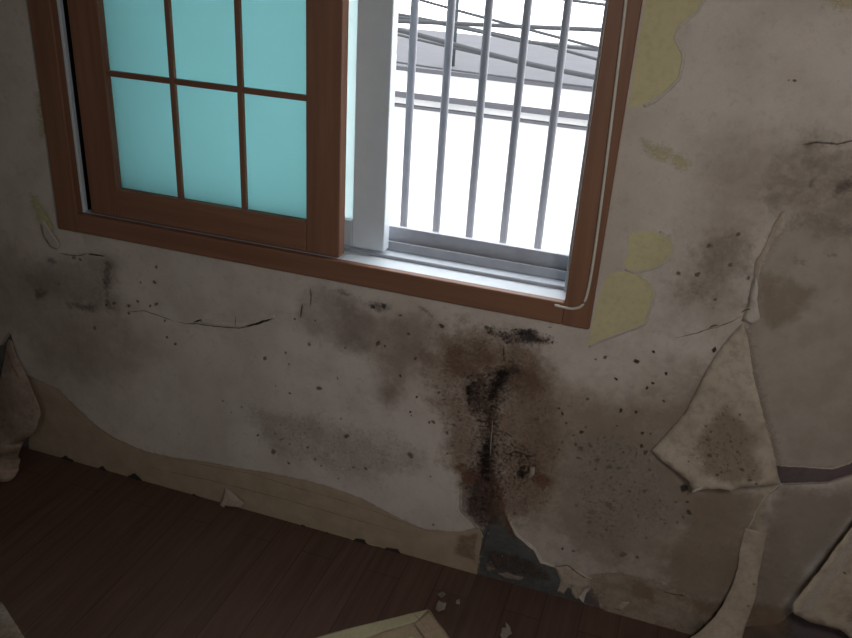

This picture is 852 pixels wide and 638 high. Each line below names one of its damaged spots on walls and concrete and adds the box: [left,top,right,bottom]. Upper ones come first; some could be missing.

peeling [628,0,706,109]
peeling [0,332,41,482]
crack [133,310,275,329]
peeling [220,488,244,508]
damp [26,323,745,585]
peeling [459,467,584,604]
peeling [587,230,676,348]
damp [591,573,722,635]
peeling [651,211,852,493]
peeling [691,527,852,638]